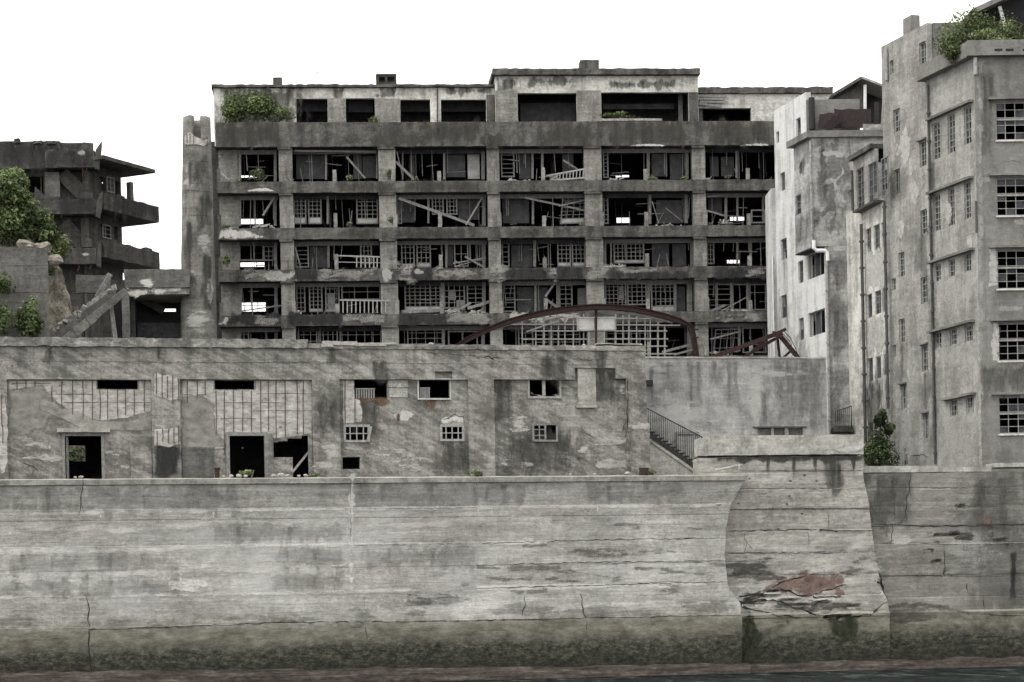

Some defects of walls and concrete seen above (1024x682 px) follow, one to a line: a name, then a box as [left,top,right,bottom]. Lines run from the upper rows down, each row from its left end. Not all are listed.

spalling [0,372,312,473]
peeling [441,414,463,424]
crack [14,454,1024,672]
spalling [726,554,859,611]